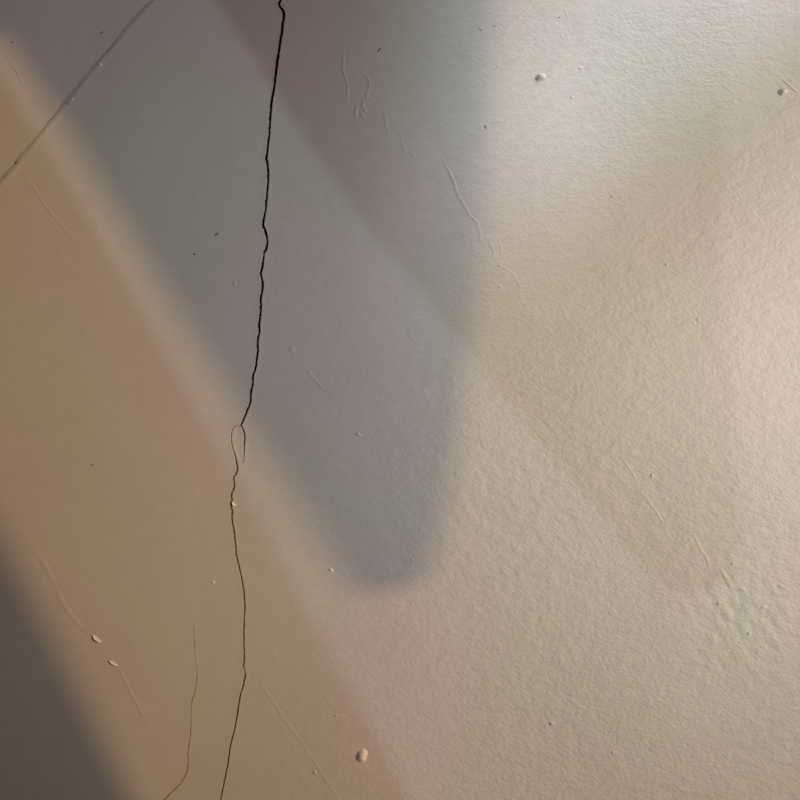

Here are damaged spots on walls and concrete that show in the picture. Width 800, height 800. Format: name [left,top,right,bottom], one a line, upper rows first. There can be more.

crack [215,0,290,800]